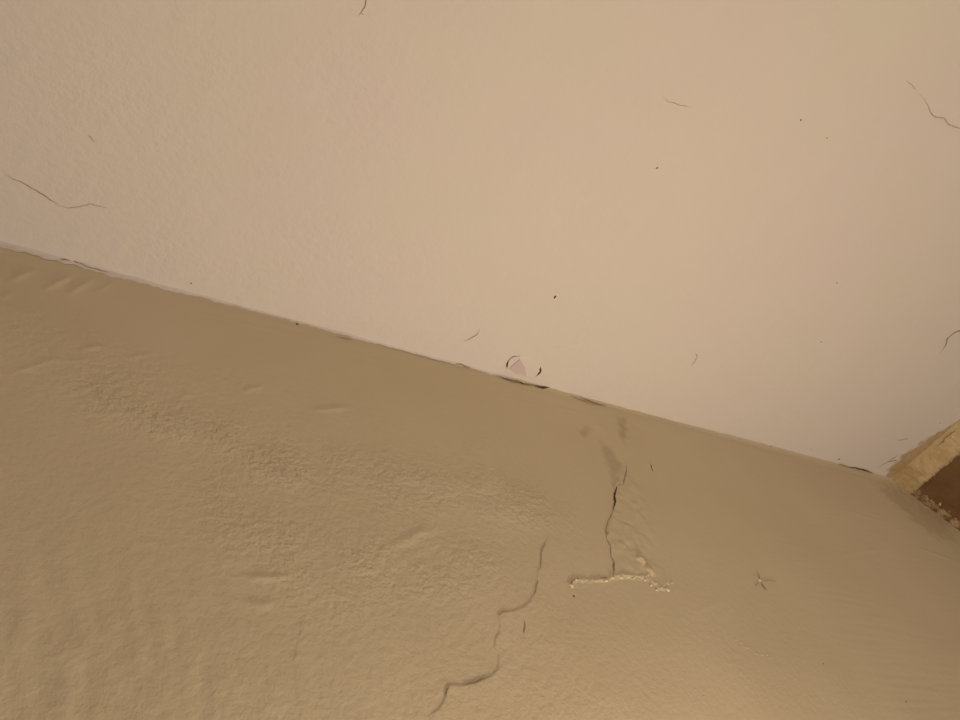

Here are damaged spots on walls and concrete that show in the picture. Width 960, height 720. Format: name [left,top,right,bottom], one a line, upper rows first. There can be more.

crack [4,174,106,208]
crack [605,462,653,573]
flaking render [911,489,960,531]